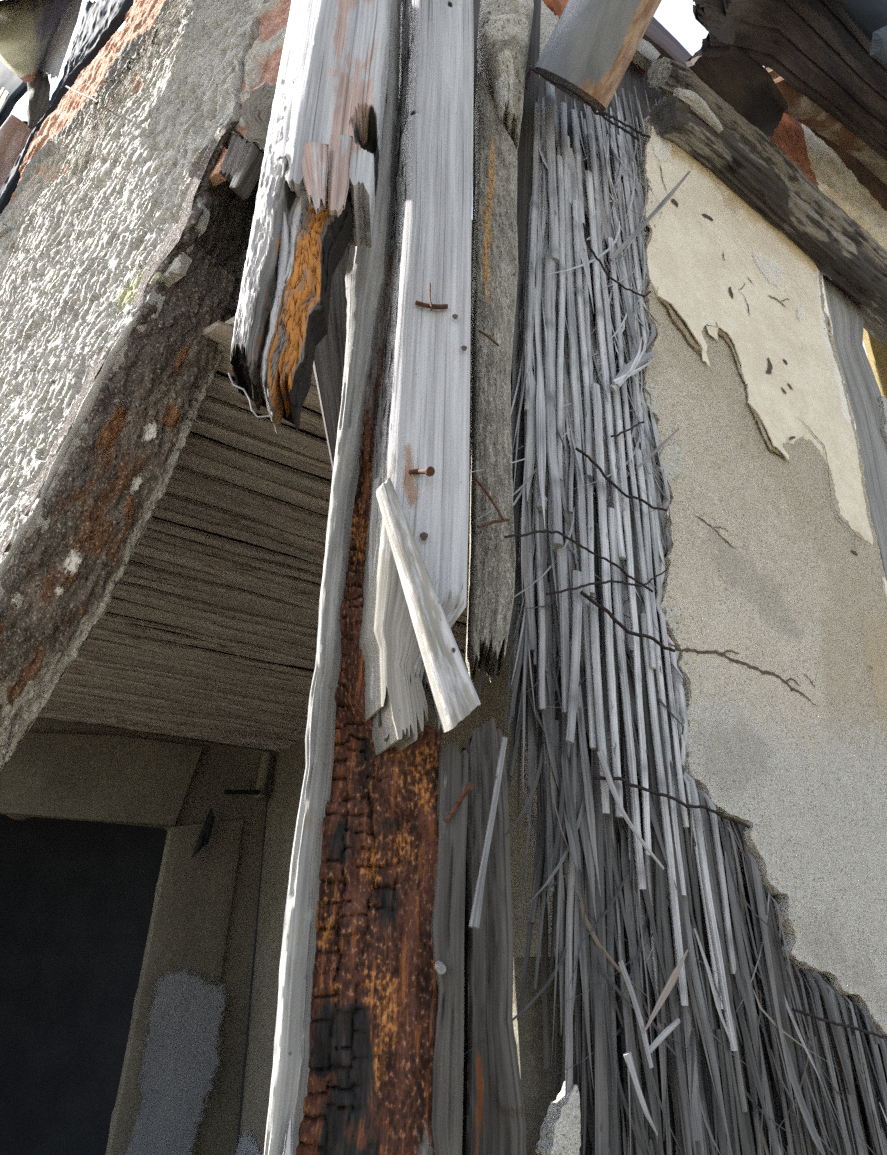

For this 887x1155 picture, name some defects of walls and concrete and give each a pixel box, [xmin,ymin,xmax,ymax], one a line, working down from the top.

flaking render [657,286,749,384]
flaking render [657,443,683,481]
flaking render [746,400,796,462]
crack [668,643,817,706]